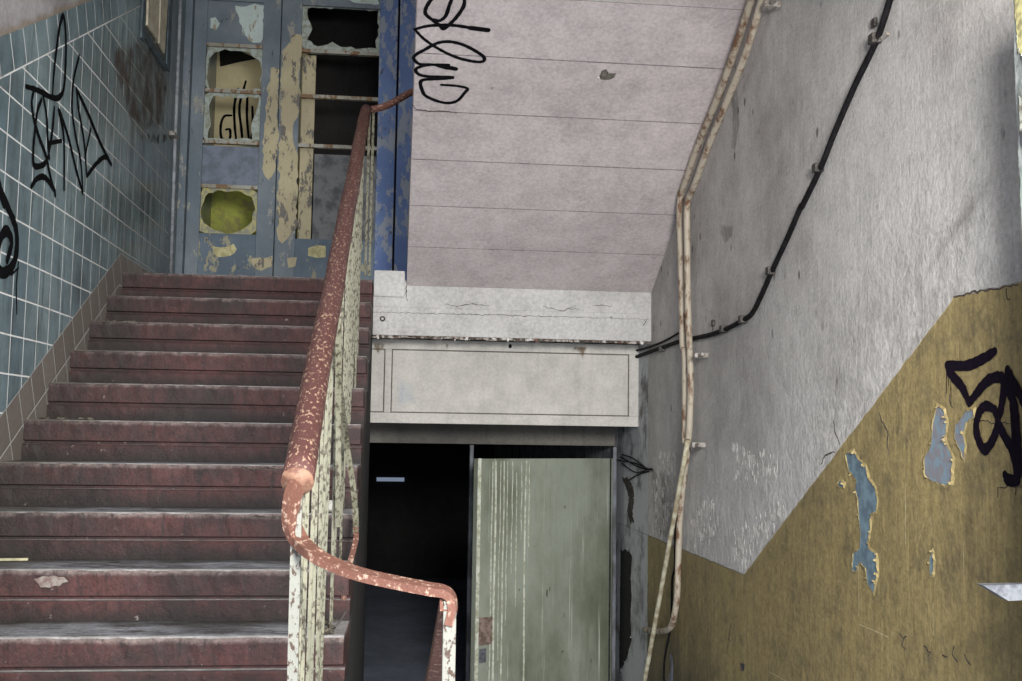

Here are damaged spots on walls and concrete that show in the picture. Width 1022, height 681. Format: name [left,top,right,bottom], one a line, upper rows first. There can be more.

peeling [1014,0,1022,56]
peeling [923,403,976,488]
peeling [836,448,879,596]